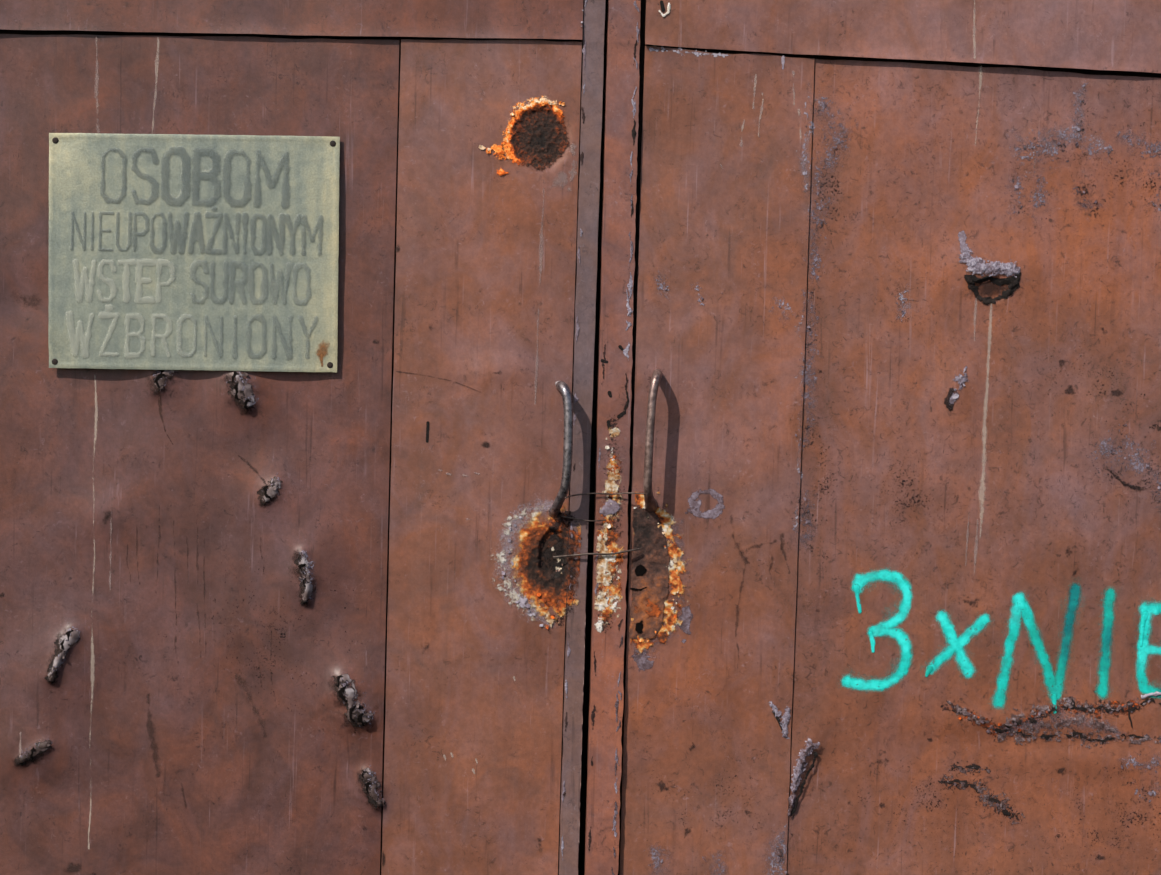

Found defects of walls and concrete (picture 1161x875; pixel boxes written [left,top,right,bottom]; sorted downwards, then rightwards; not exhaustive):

rust [492,503,582,629]
rust [594,415,625,633]